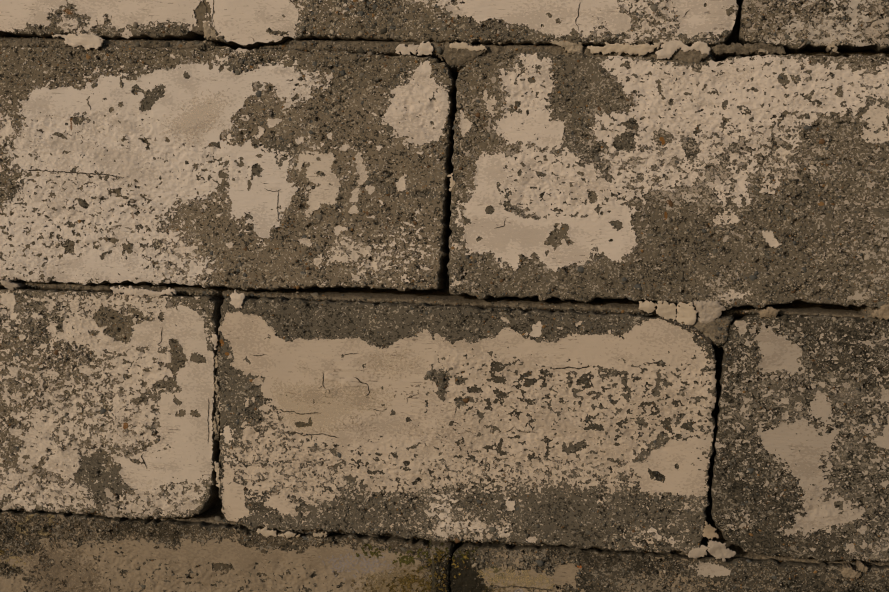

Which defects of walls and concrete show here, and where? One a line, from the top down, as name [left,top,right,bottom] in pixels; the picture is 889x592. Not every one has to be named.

peeling [0,0,889,330]
peeling [0,285,889,592]